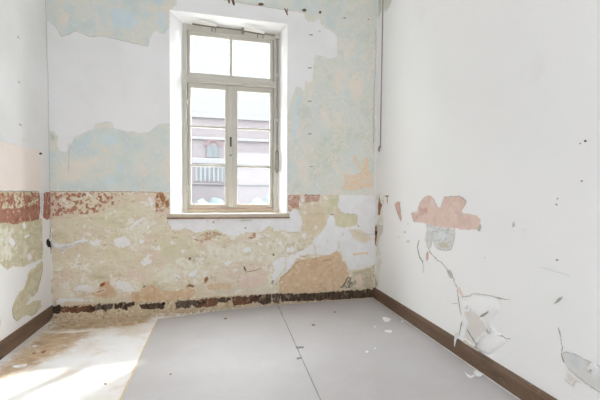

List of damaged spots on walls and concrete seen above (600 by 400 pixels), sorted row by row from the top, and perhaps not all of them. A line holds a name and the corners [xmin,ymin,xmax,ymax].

peeling [0,0,383,321]
spalling [411,195,481,251]
crack [417,241,510,344]
peeling [561,352,600,393]